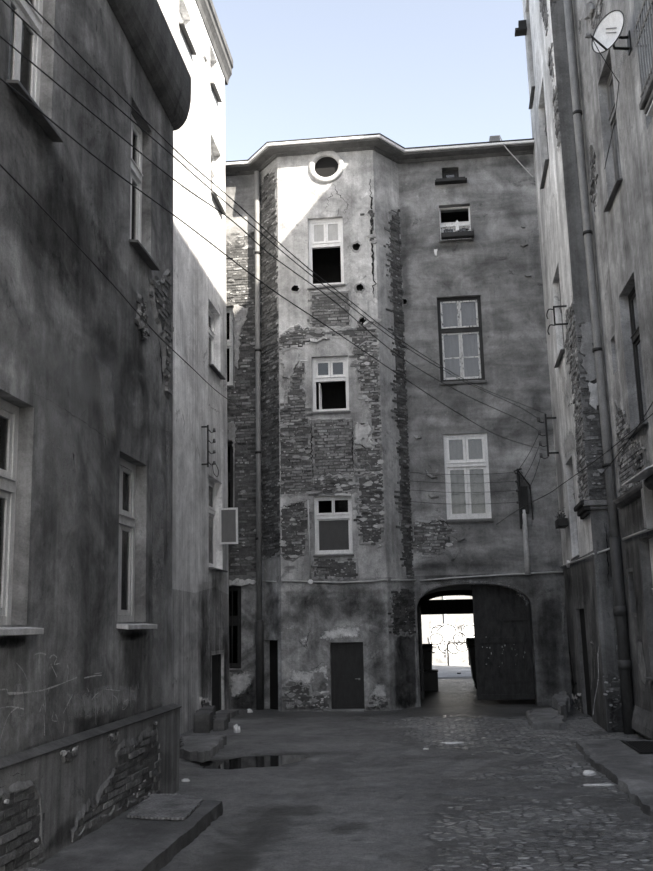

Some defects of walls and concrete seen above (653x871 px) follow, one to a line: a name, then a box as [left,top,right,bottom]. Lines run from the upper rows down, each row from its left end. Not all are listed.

flaking render [578,0,605,36]
flaking render [539,0,561,154]
crack [369,179,377,294]
flaking render [589,141,598,223]
flaking render [134,269,174,400]
flaking render [226,168,467,639]
flaking render [565,298,607,502]
flaking render [614,399,645,496]
flaking render [282,679,330,710]
flaking render [0,780,46,871]
flaking render [70,719,162,842]